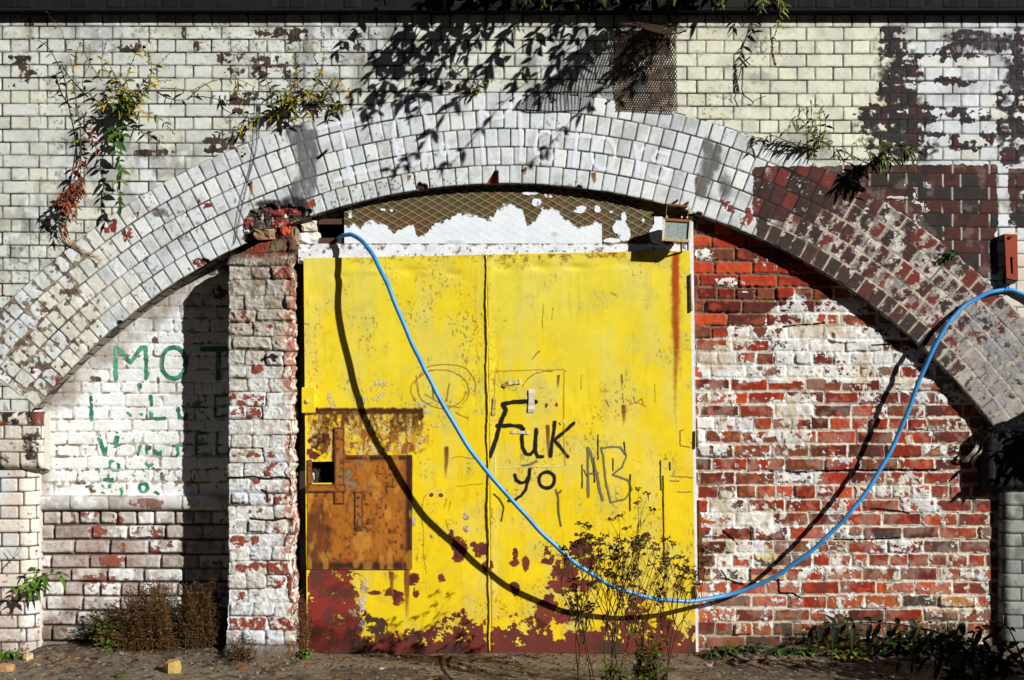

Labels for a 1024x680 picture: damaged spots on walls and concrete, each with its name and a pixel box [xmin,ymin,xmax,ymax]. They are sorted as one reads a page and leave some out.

spalling [241,199,316,243]
peeling [344,191,631,243]
rust [672,252,680,374]
peeling [694,248,713,261]
flaking render [697,26,1024,644]
peeling [0,209,707,654]
rust [308,407,430,531]